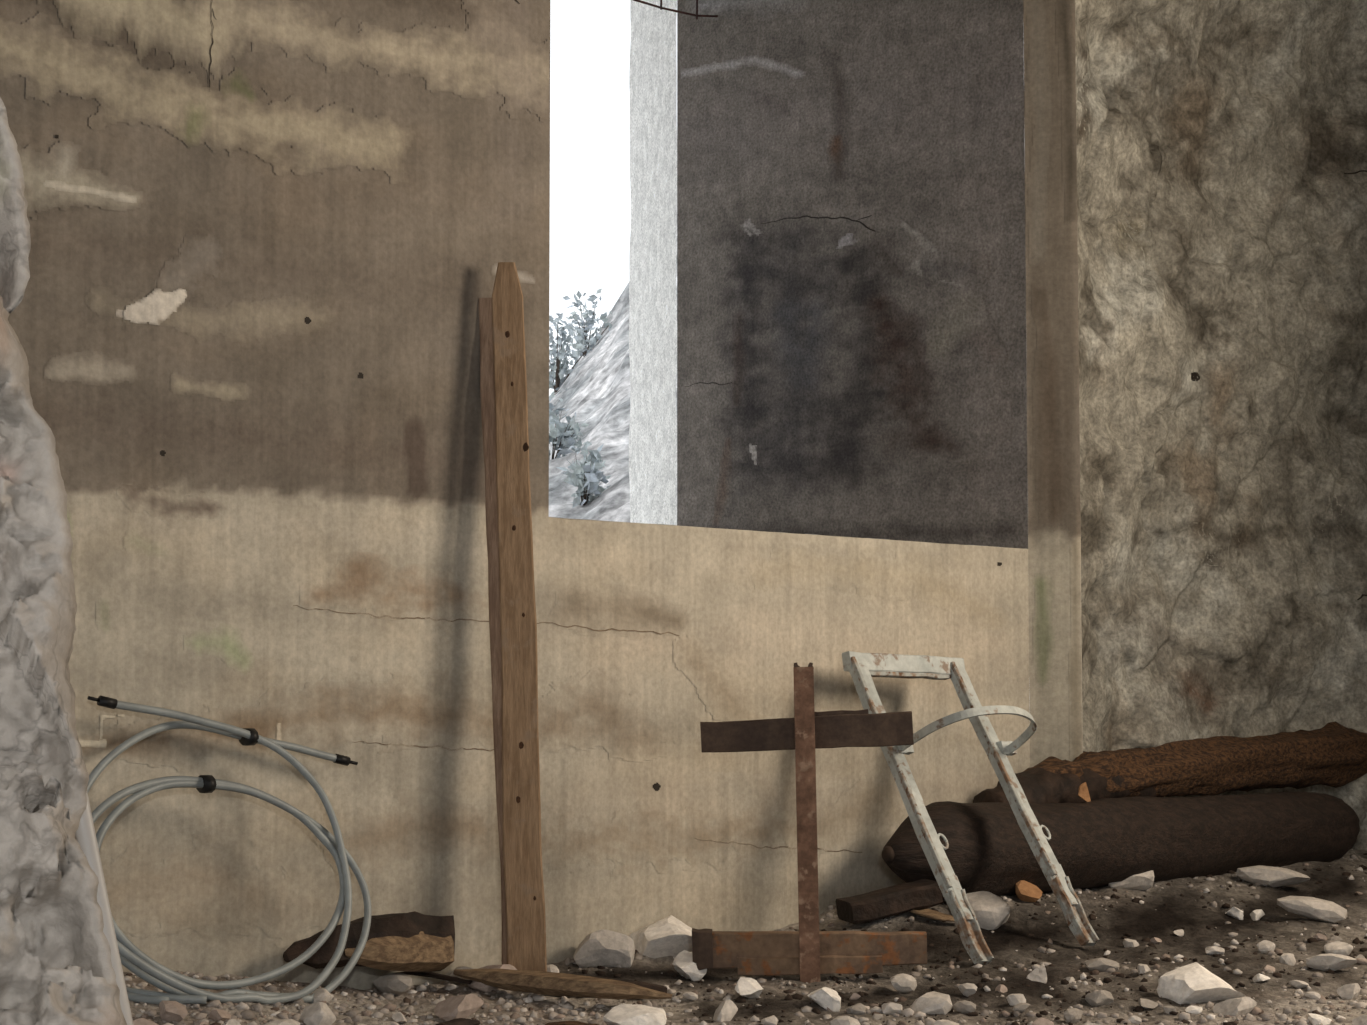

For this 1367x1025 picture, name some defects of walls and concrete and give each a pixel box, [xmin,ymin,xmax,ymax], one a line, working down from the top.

spalling [633,0,718,20]
damp [686,0,811,21]
damp [17,140,144,220]
damp [0,0,549,184]
damp [681,43,855,188]
damp [1024,0,1097,267]
spalling [116,288,187,326]
damp [85,233,336,345]
damp [44,348,138,387]
damp [170,372,252,402]
damp [681,284,1075,631]
damp [1066,540,1082,762]